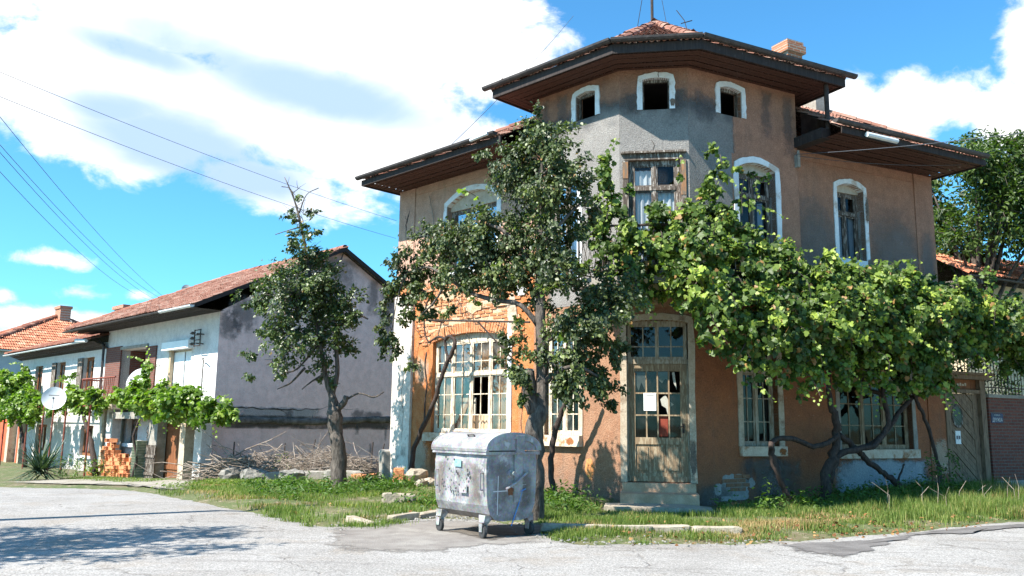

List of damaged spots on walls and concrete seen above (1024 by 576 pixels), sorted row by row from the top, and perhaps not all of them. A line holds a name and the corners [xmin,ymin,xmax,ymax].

spalling [415,277,526,346]
spalling [714,474,755,501]